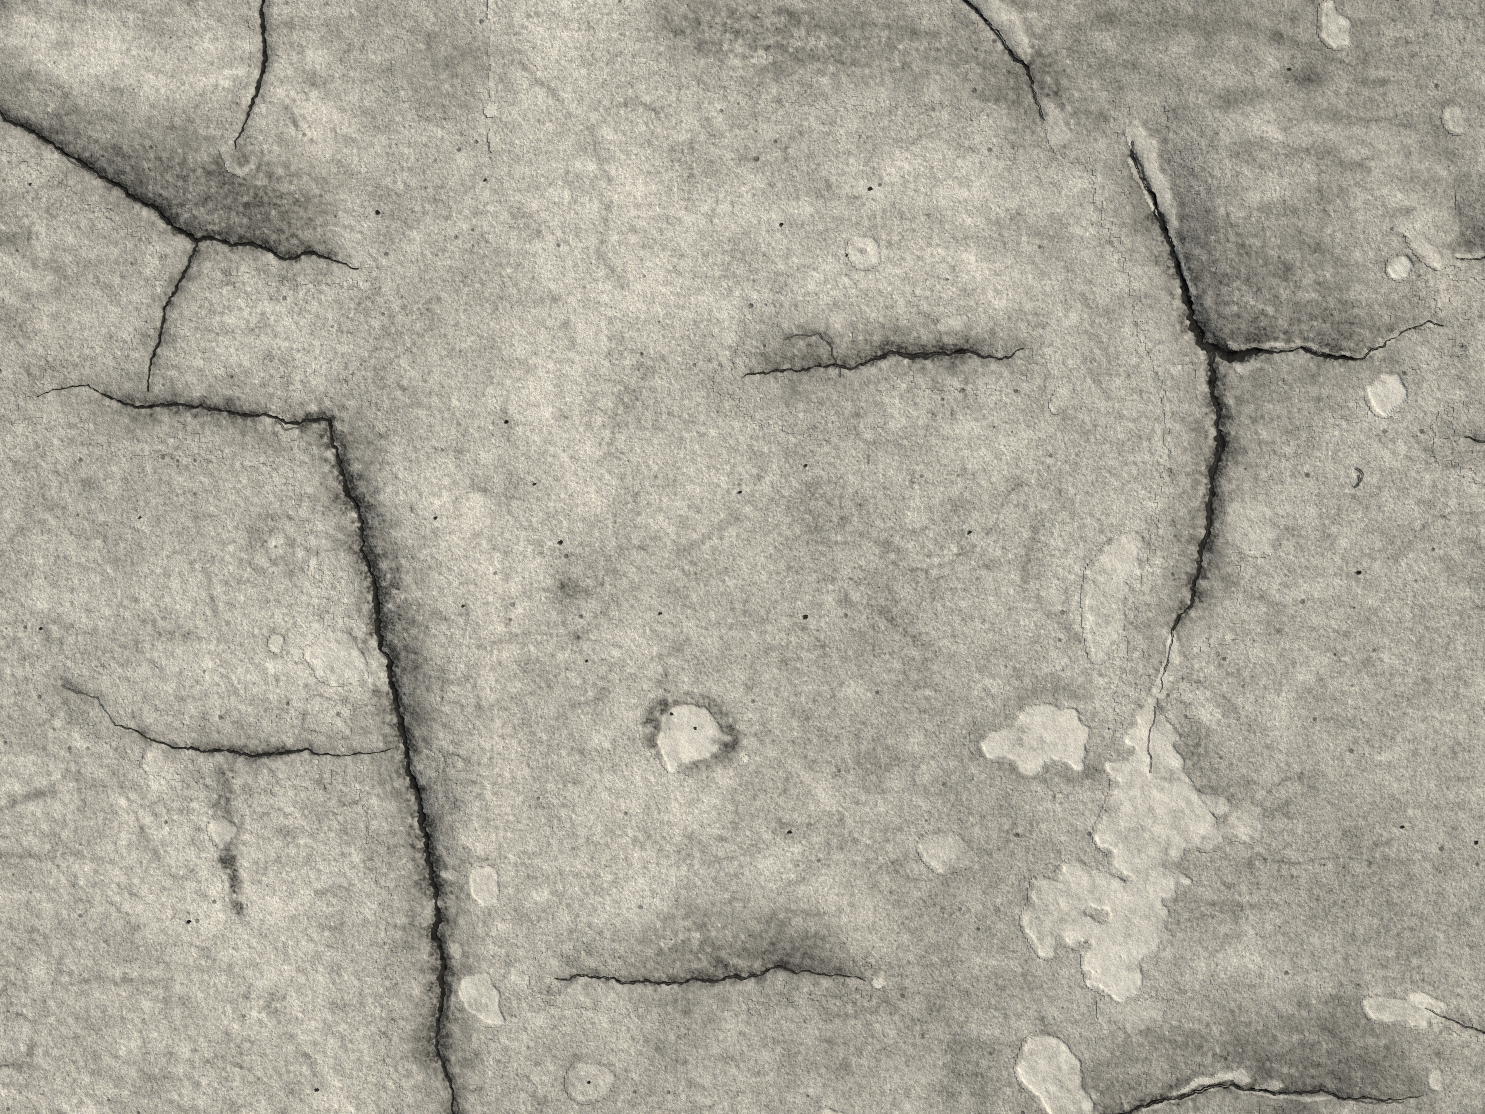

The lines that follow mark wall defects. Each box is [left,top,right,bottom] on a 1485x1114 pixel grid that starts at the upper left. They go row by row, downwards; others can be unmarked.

crack [710,304,1052,407]
crack [932,0,1485,773]
crack [0,0,884,1114]
spalling [654,698,749,773]
spalling [978,688,1271,1036]
spalling [1014,1029,1099,1114]
crack [1097,1053,1445,1114]